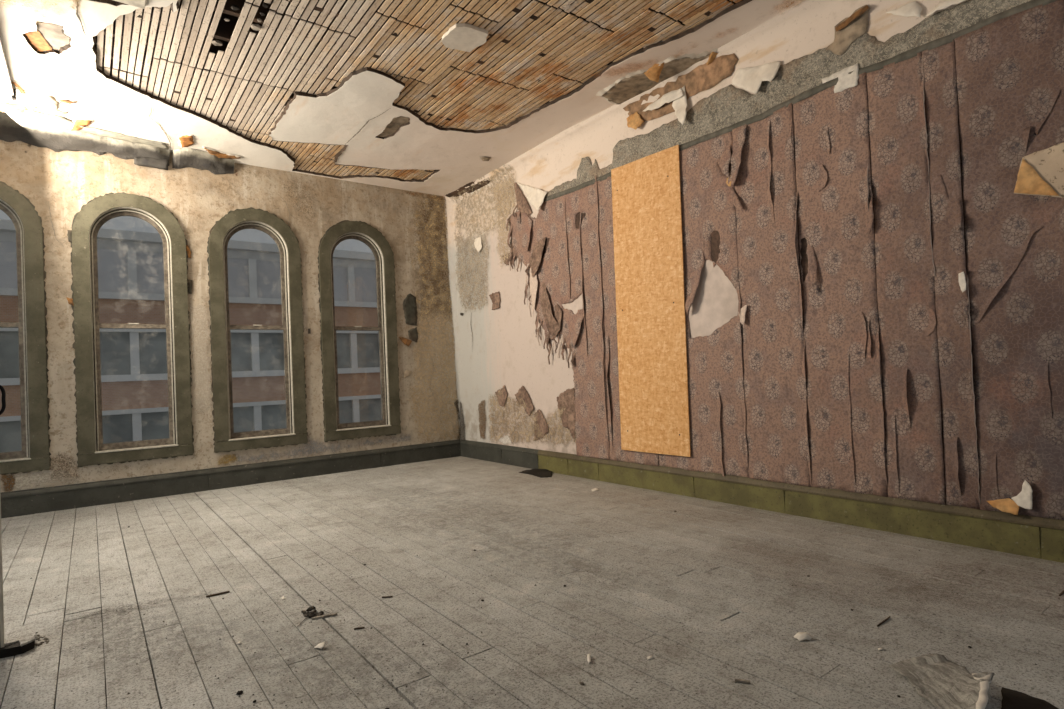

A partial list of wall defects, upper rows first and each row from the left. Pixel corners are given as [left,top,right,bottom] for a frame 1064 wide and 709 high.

flaking render [91,0,781,182]
flaking render [825,5,870,55]
flaking render [922,0,965,17]
peeling [445,156,548,316]